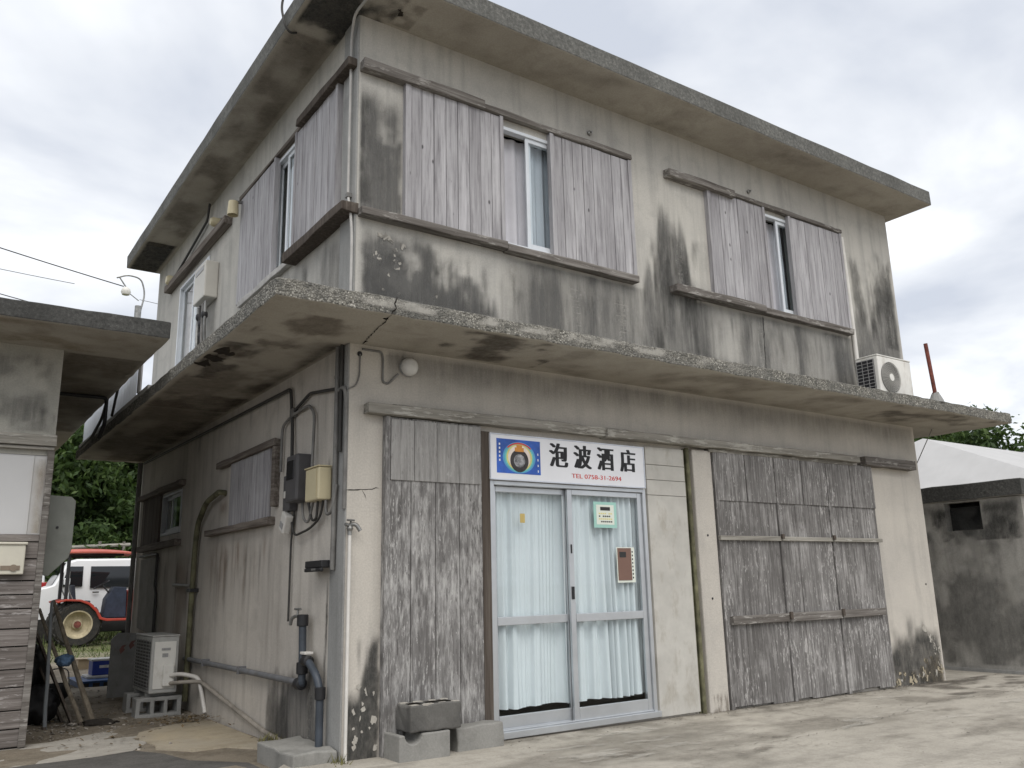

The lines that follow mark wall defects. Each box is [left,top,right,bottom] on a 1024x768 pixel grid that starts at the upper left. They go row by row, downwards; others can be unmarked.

crack [363,298,397,344]
damp [364,237,495,317]
damp [469,332,516,361]
damp [524,265,631,339]
damp [647,221,711,357]
damp [795,326,807,375]
damp [832,292,899,385]
flaking render [897,624,944,687]
flaking render [352,684,377,751]